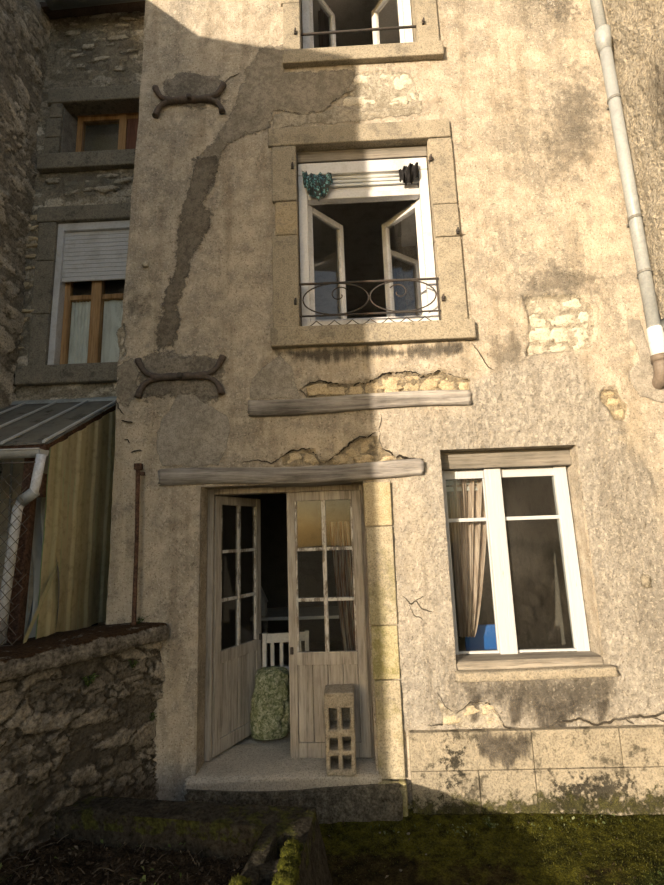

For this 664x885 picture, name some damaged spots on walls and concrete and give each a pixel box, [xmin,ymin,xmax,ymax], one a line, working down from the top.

spalling [272,70,422,129]
spalling [524,294,594,356]
spalling [306,371,470,398]
spalling [282,436,403,467]
crack [402,596,432,620]
spalling [437,699,503,729]
damp [510,699,522,724]
crack [428,693,664,729]
damp [534,702,575,728]
damp [440,733,474,789]
damp [479,730,528,769]
mould [547,766,637,810]